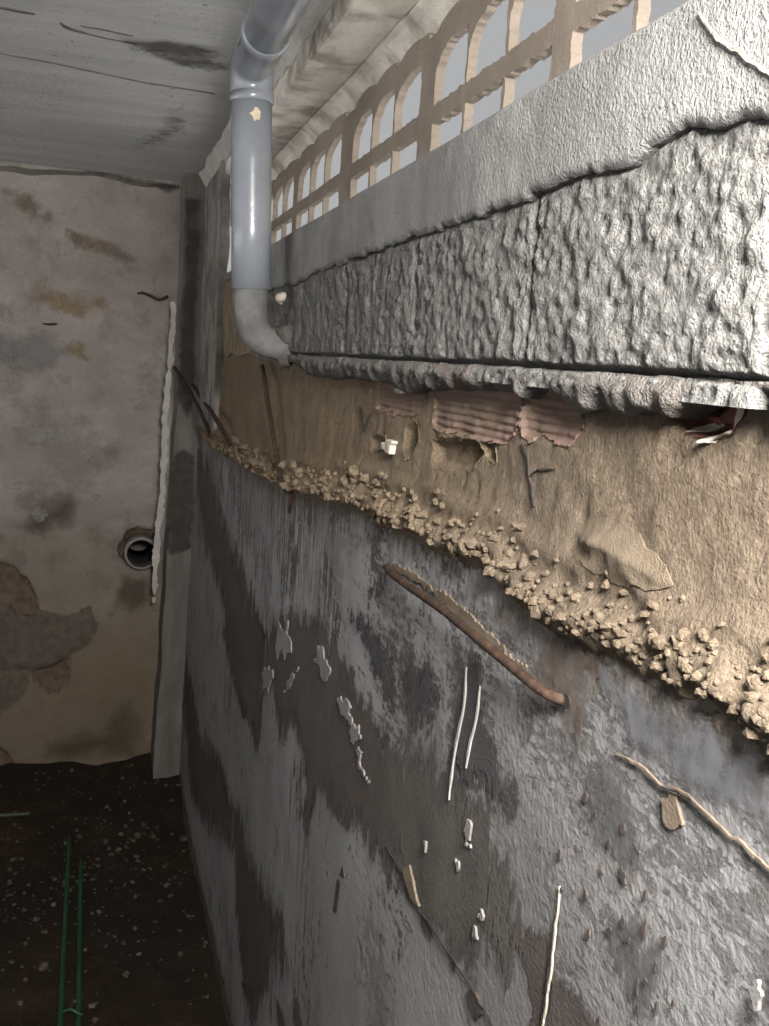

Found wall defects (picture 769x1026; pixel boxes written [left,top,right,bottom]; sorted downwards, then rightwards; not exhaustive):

crack [0,7,35,15]
crack [0,22,225,95]
crack [698,12,769,75]
spalling [260,364,293,514]
flaking render [370,381,585,477]
spalling [667,407,749,444]
spalling [0,562,40,617]
corrosion [383,564,596,770]
peeling [182,451,601,1026]
crack [615,753,769,871]
crack [386,846,494,1026]